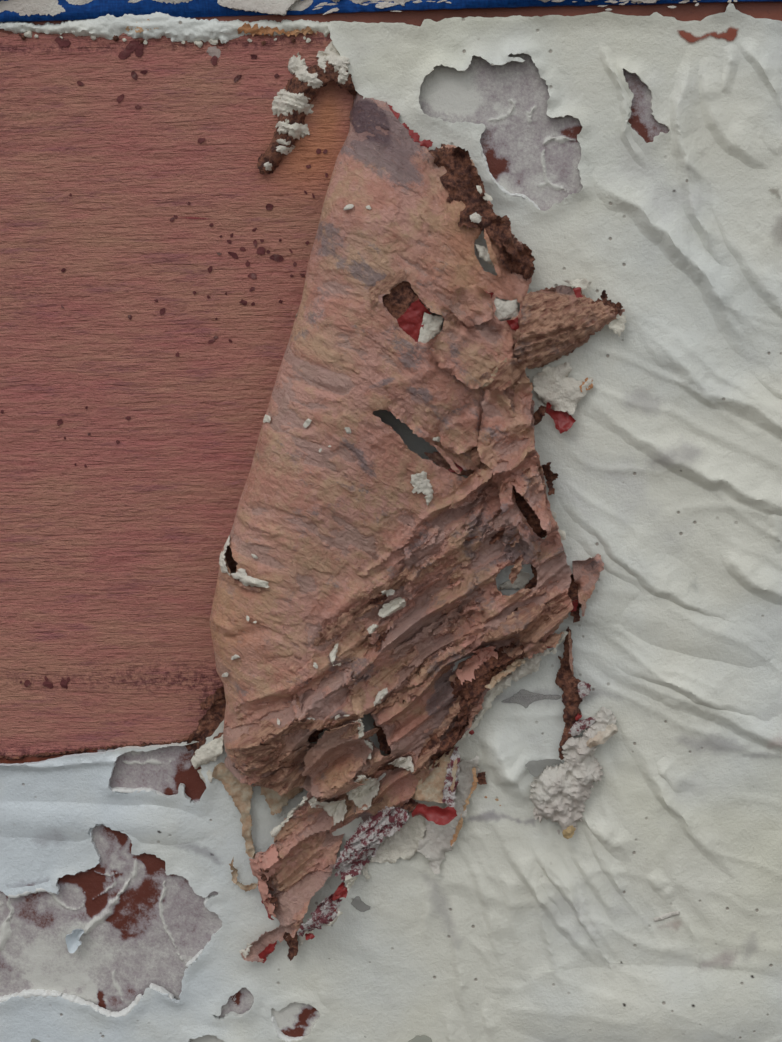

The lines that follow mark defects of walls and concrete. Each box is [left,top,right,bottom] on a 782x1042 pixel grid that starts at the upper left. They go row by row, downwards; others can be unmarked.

peeling [98,54,627,963]
peeling [0,825,222,1018]
peeling [218,987,254,1017]
peeling [271,1002,320,1041]